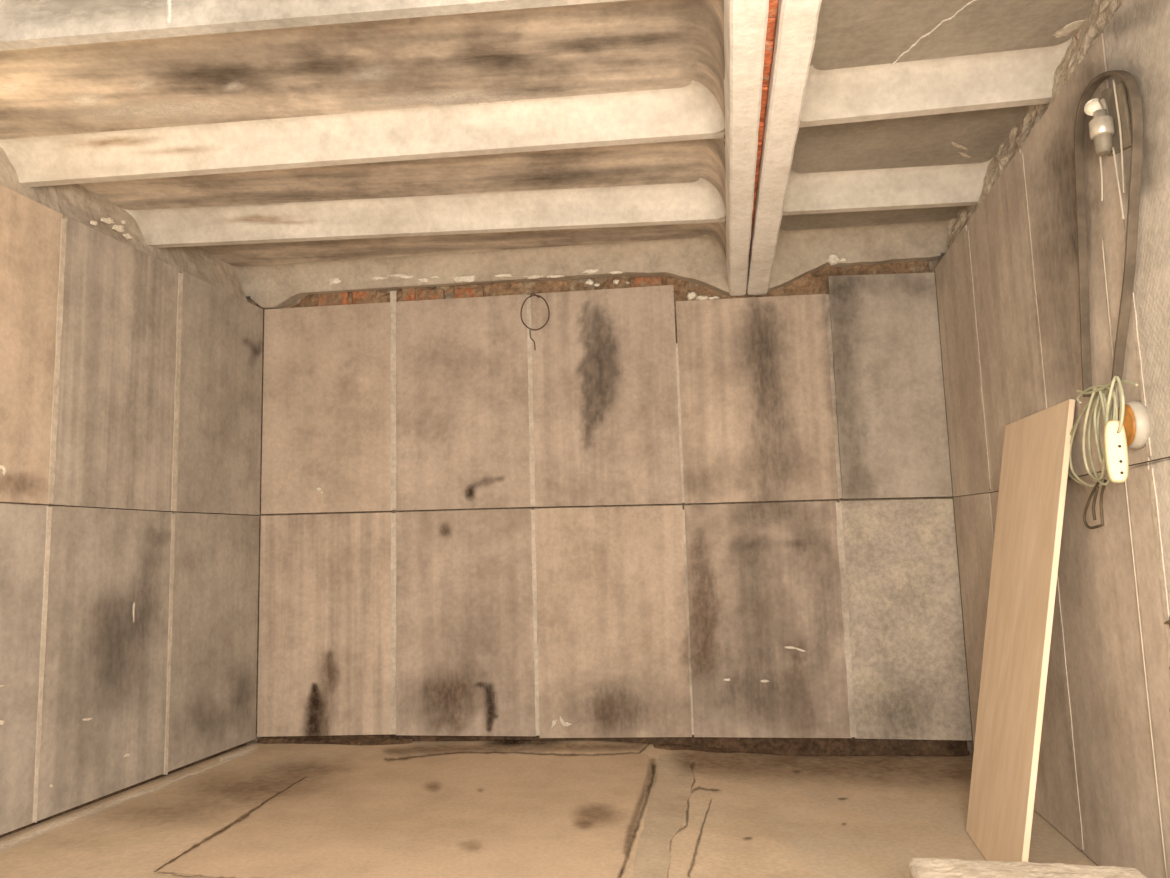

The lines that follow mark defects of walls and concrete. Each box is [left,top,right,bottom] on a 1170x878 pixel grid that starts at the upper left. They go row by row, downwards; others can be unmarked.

crack [892,0,976,64]
spalling [947,0,1124,249]
spalling [370,274,439,283]
leakage [306,684,322,740]
leakage [434,682,555,750]